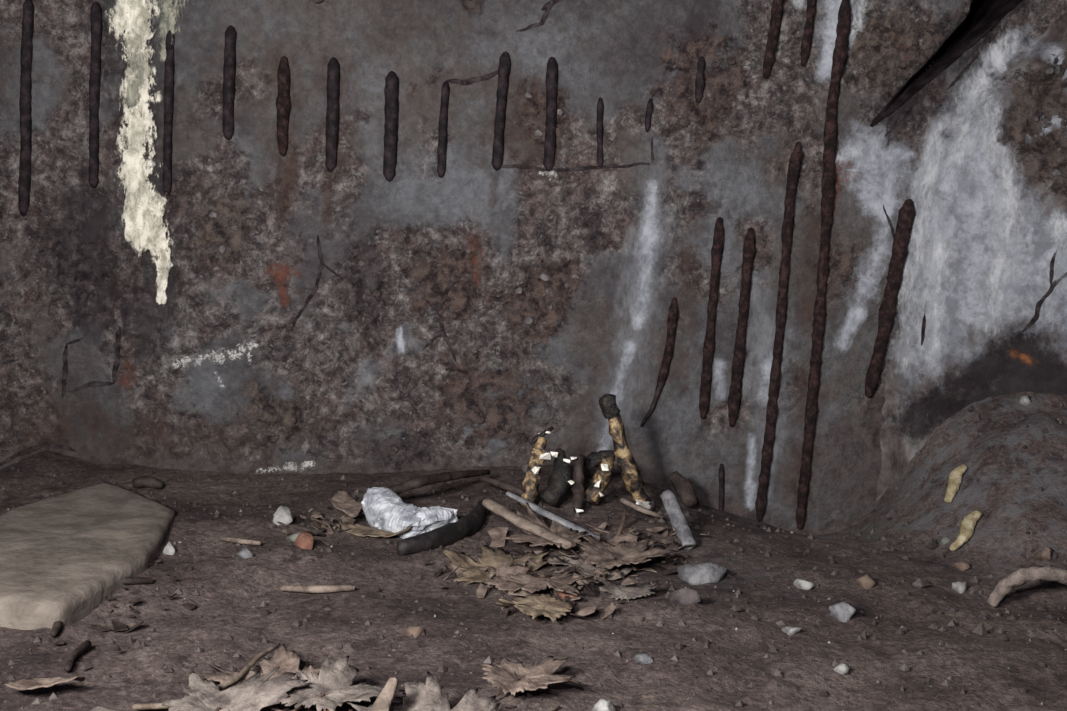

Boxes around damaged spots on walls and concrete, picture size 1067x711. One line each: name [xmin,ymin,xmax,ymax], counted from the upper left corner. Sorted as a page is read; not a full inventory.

crack [517,0,561,31]
spalling [512,80,575,144]
spalling [649,16,761,149]
water stain [60,0,187,358]
water stain [834,21,1067,439]